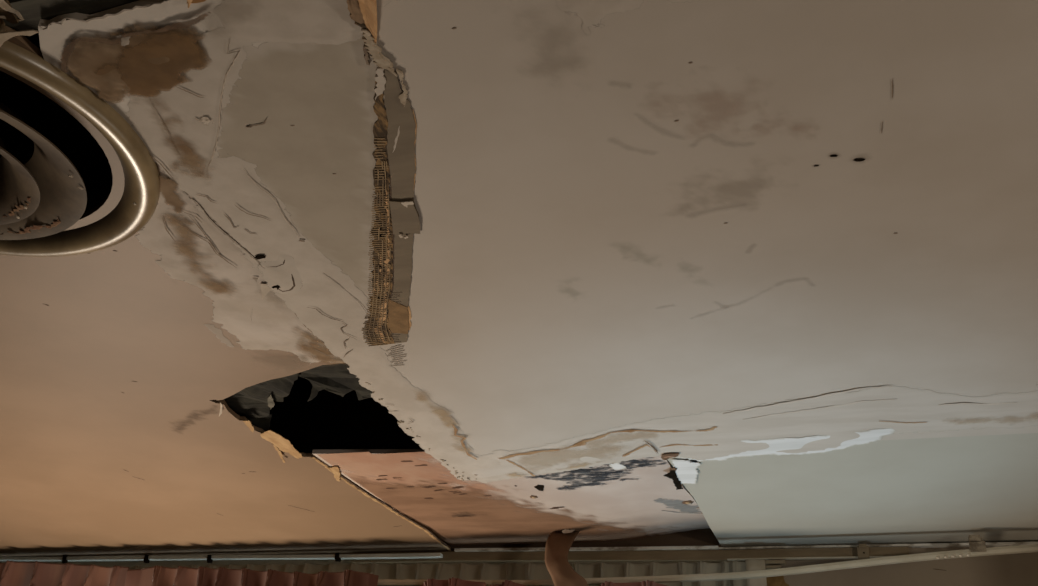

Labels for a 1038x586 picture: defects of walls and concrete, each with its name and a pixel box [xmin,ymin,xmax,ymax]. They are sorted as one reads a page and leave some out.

damp [61,12,210,103]
damp [317,452,666,546]
damp [655,498,700,514]